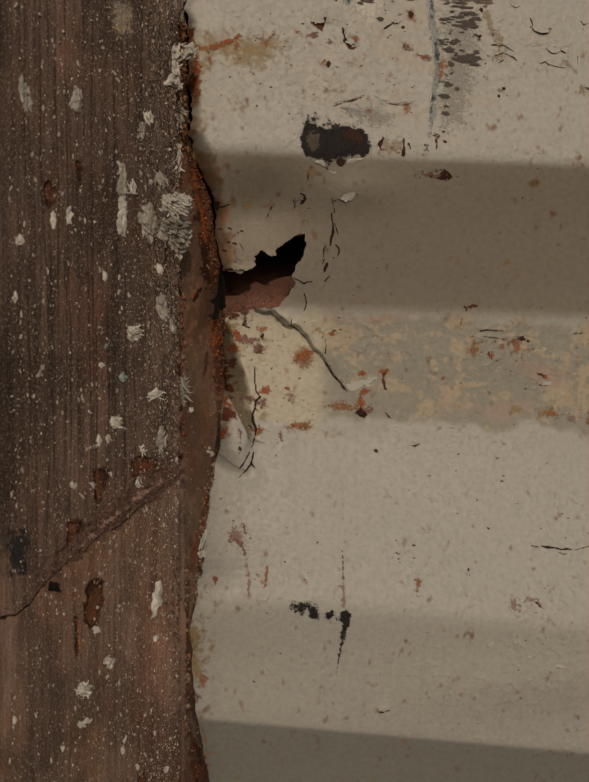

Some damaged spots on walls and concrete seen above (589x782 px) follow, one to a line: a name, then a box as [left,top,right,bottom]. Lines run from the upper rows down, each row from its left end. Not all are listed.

peeling [384,11,415,29]
peeling [477,8,507,59]
rust [187,28,241,106]
peeling [378,138,411,157]
rust [181,132,219,296]
rust [292,347,313,369]
rust [488,336,530,359]
crack [238,368,261,478]
rust [328,388,373,418]
rust [185,484,210,782]